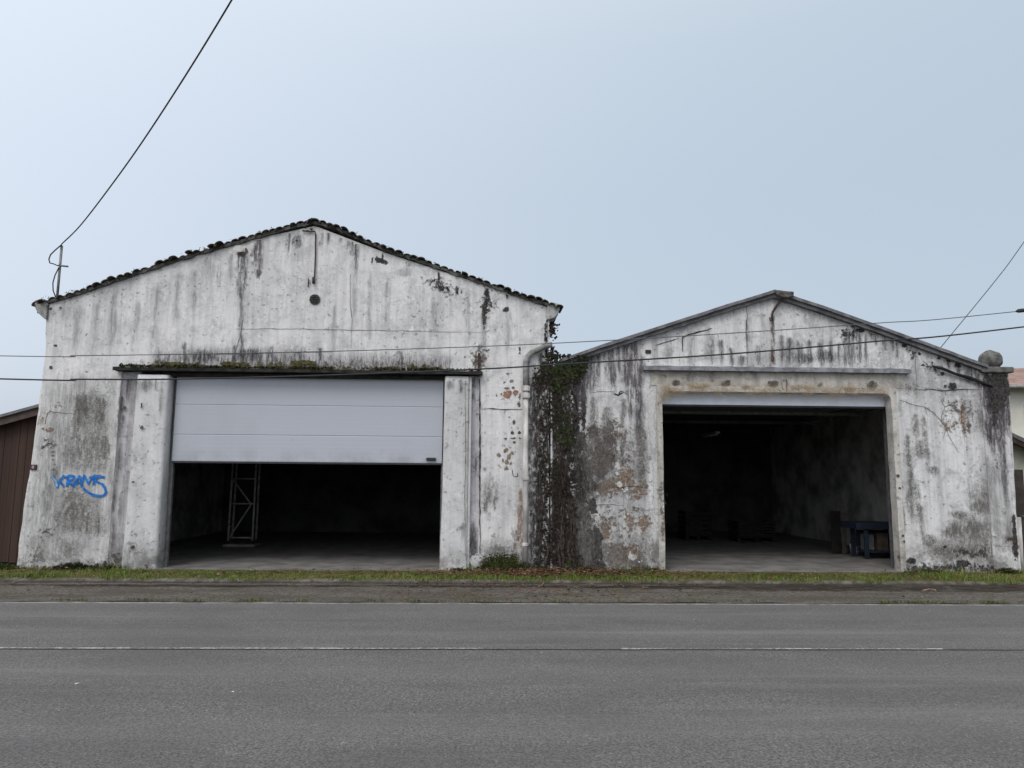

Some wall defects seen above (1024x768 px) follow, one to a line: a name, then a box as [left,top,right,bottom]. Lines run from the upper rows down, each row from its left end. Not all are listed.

water stain [238,240,262,324]
water stain [479,288,509,329]
water stain [157,340,300,366]
water stain [780,326,921,362]
flaking render [496,373,521,407]
peeling [496,417,521,470]
water stain [459,320,665,570]
crack [901,357,978,477]
peeling [939,396,977,450]
water stain [947,362,1011,492]
peeling [582,391,659,569]
water stain [1006,513,1019,561]